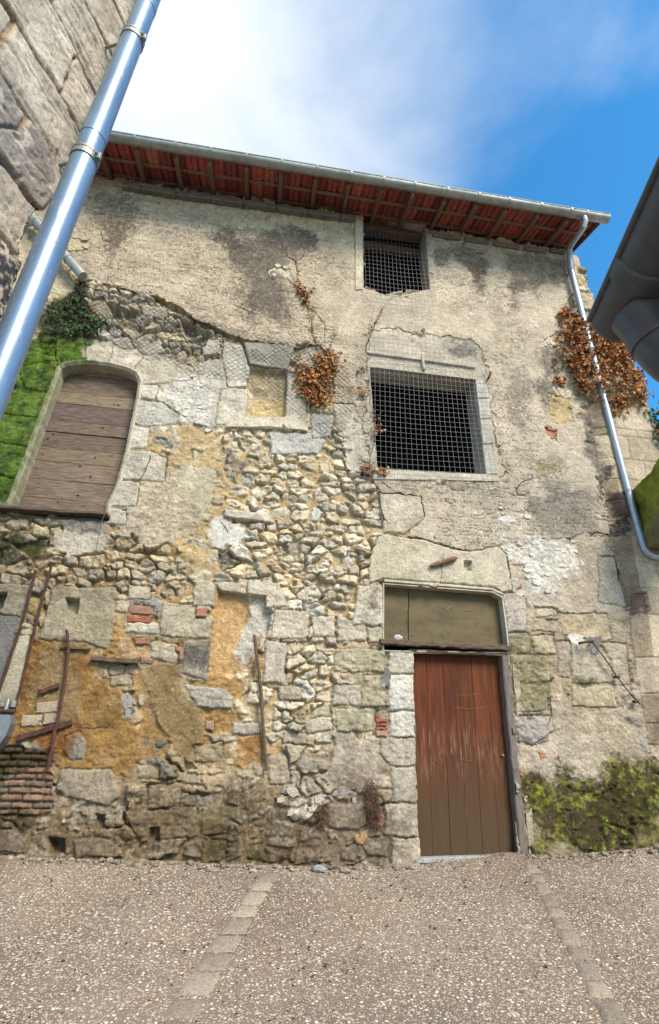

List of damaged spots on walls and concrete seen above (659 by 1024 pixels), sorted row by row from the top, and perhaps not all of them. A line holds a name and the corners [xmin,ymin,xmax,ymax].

damp [89,192,138,265]
damp [211,225,318,324]
damp [432,242,566,360]
peeling [166,370,220,433]
flaking render [338,409,372,474]
damp [0,477,16,500]
corrosion [35,718,86,756]
peeling [277,785,325,820]
damp [520,771,542,804]